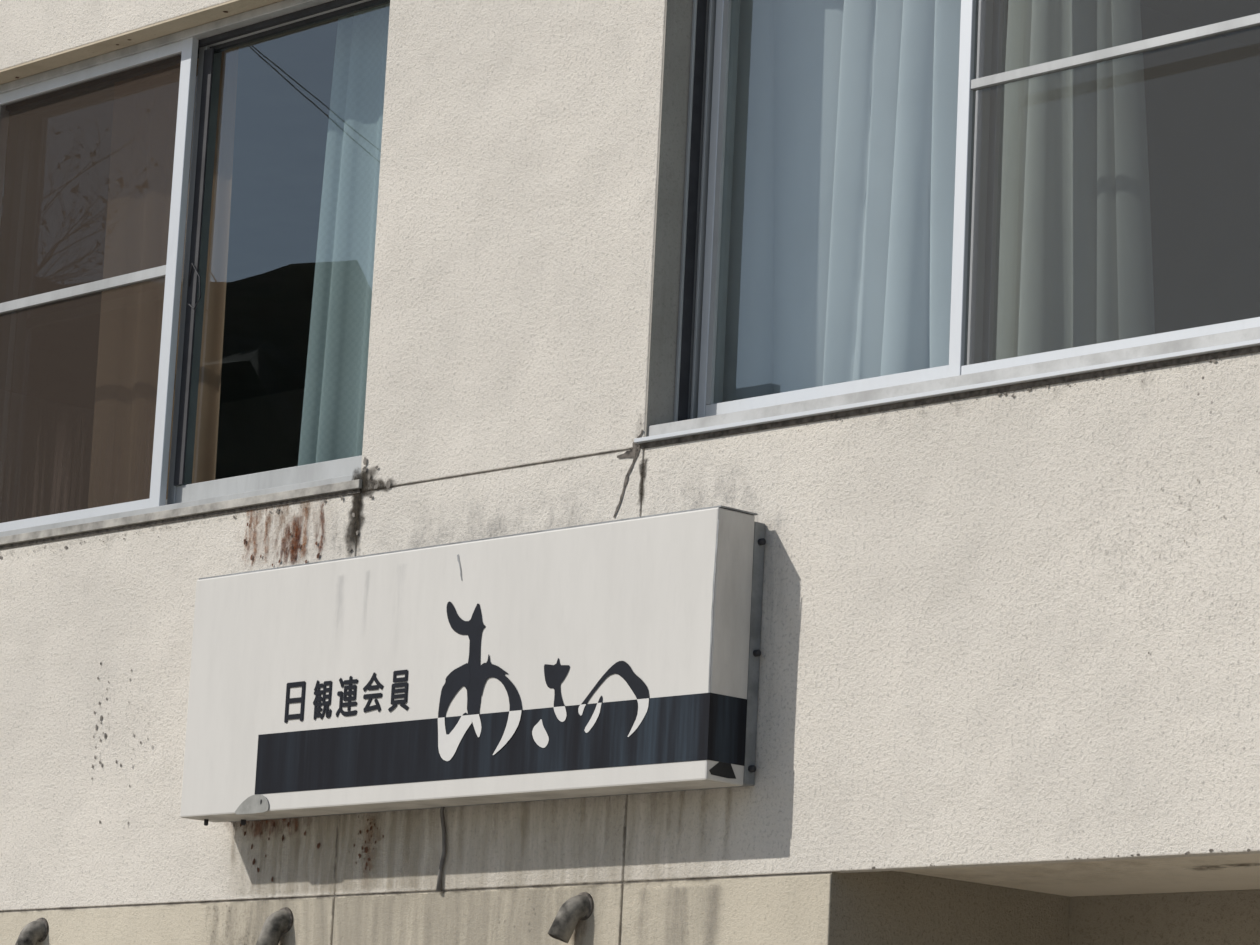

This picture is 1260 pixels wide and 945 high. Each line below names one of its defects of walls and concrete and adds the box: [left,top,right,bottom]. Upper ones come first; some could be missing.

corrosion [244,506,324,566]
water stain [324,457,391,552]
crack [613,430,643,518]
corrosion [231,818,306,881]